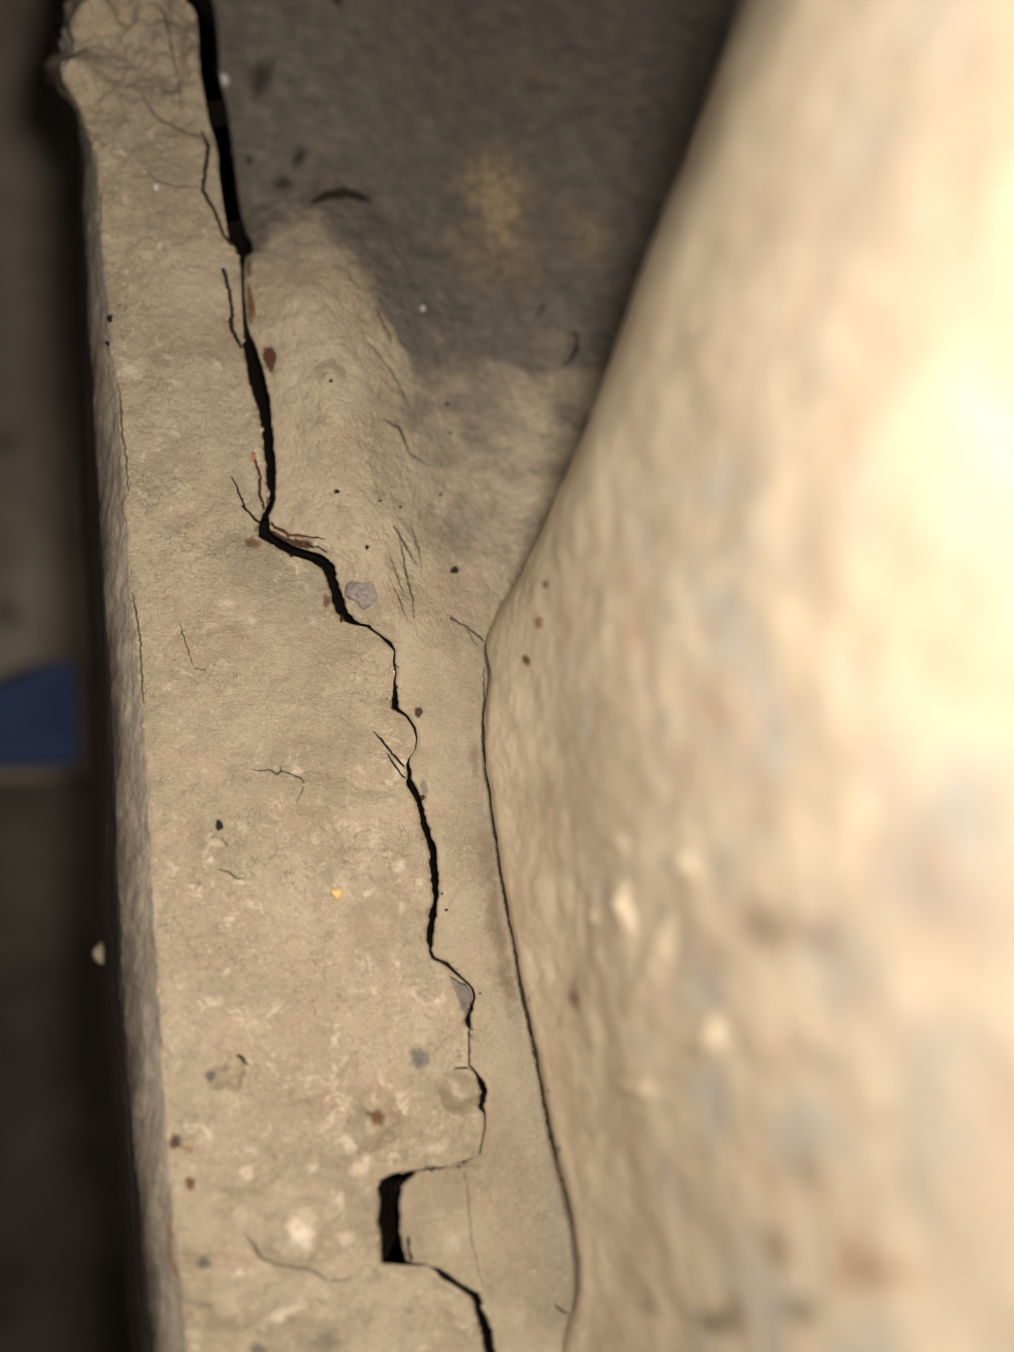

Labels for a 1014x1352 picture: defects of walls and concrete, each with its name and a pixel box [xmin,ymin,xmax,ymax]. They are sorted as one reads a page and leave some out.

crack [191,0,216,28]
crack [179,624,206,671]
crack [201,98,496,1352]